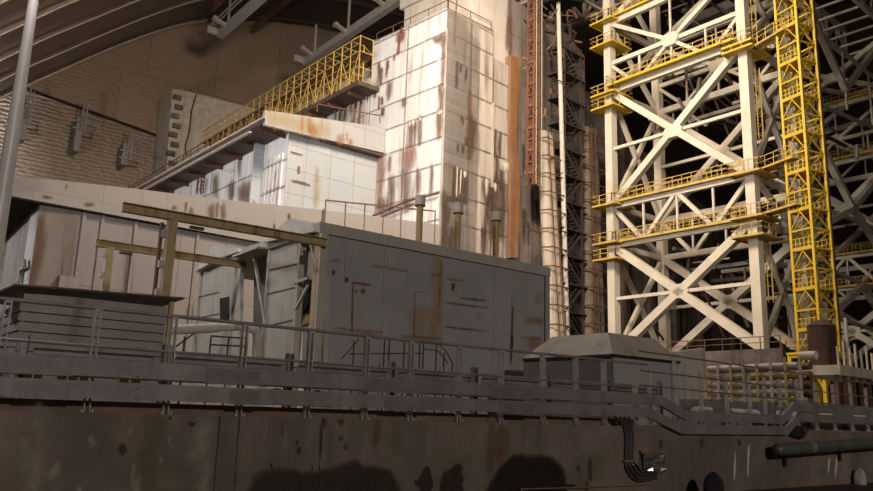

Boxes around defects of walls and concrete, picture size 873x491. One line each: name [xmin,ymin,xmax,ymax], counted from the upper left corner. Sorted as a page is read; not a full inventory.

rust [433,34,445,136]
rust [506,0,518,127]
rust [210,177,249,217]
rust [377,116,433,212]